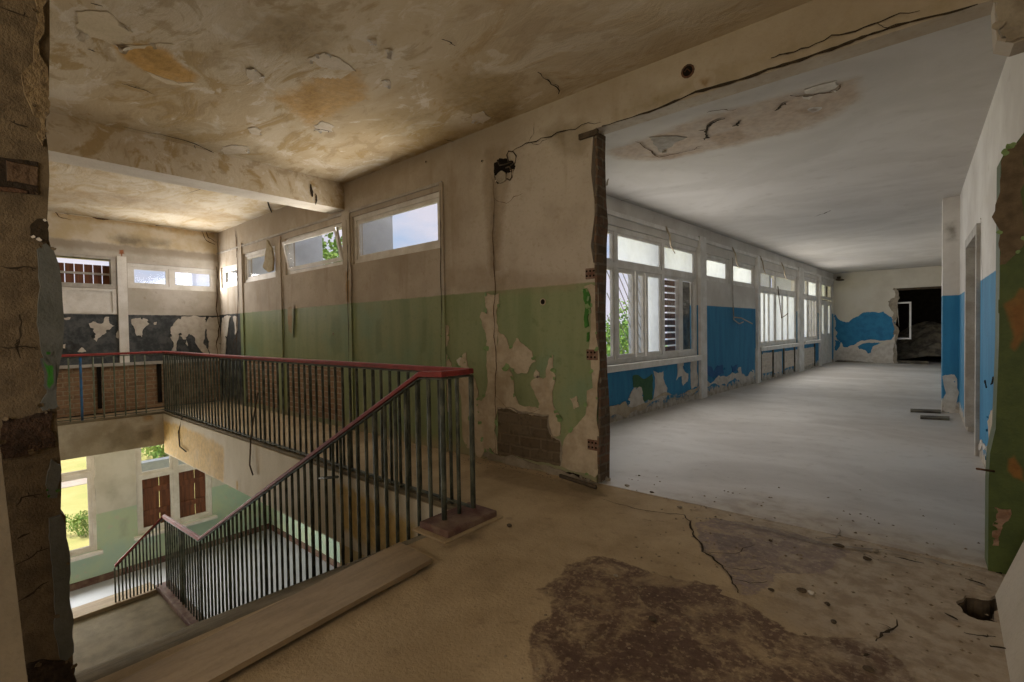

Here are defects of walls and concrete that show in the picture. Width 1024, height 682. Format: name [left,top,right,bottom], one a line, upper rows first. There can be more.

crack [513,4,978,157]
flaking render [439,128,815,482]
peeling [78,317,119,352]
peeling [131,317,157,338]
peeling [169,315,238,354]
peeling [834,288,900,363]
peeling [942,374,959,413]
crack [604,499,987,593]
flaking render [989,507,1012,546]